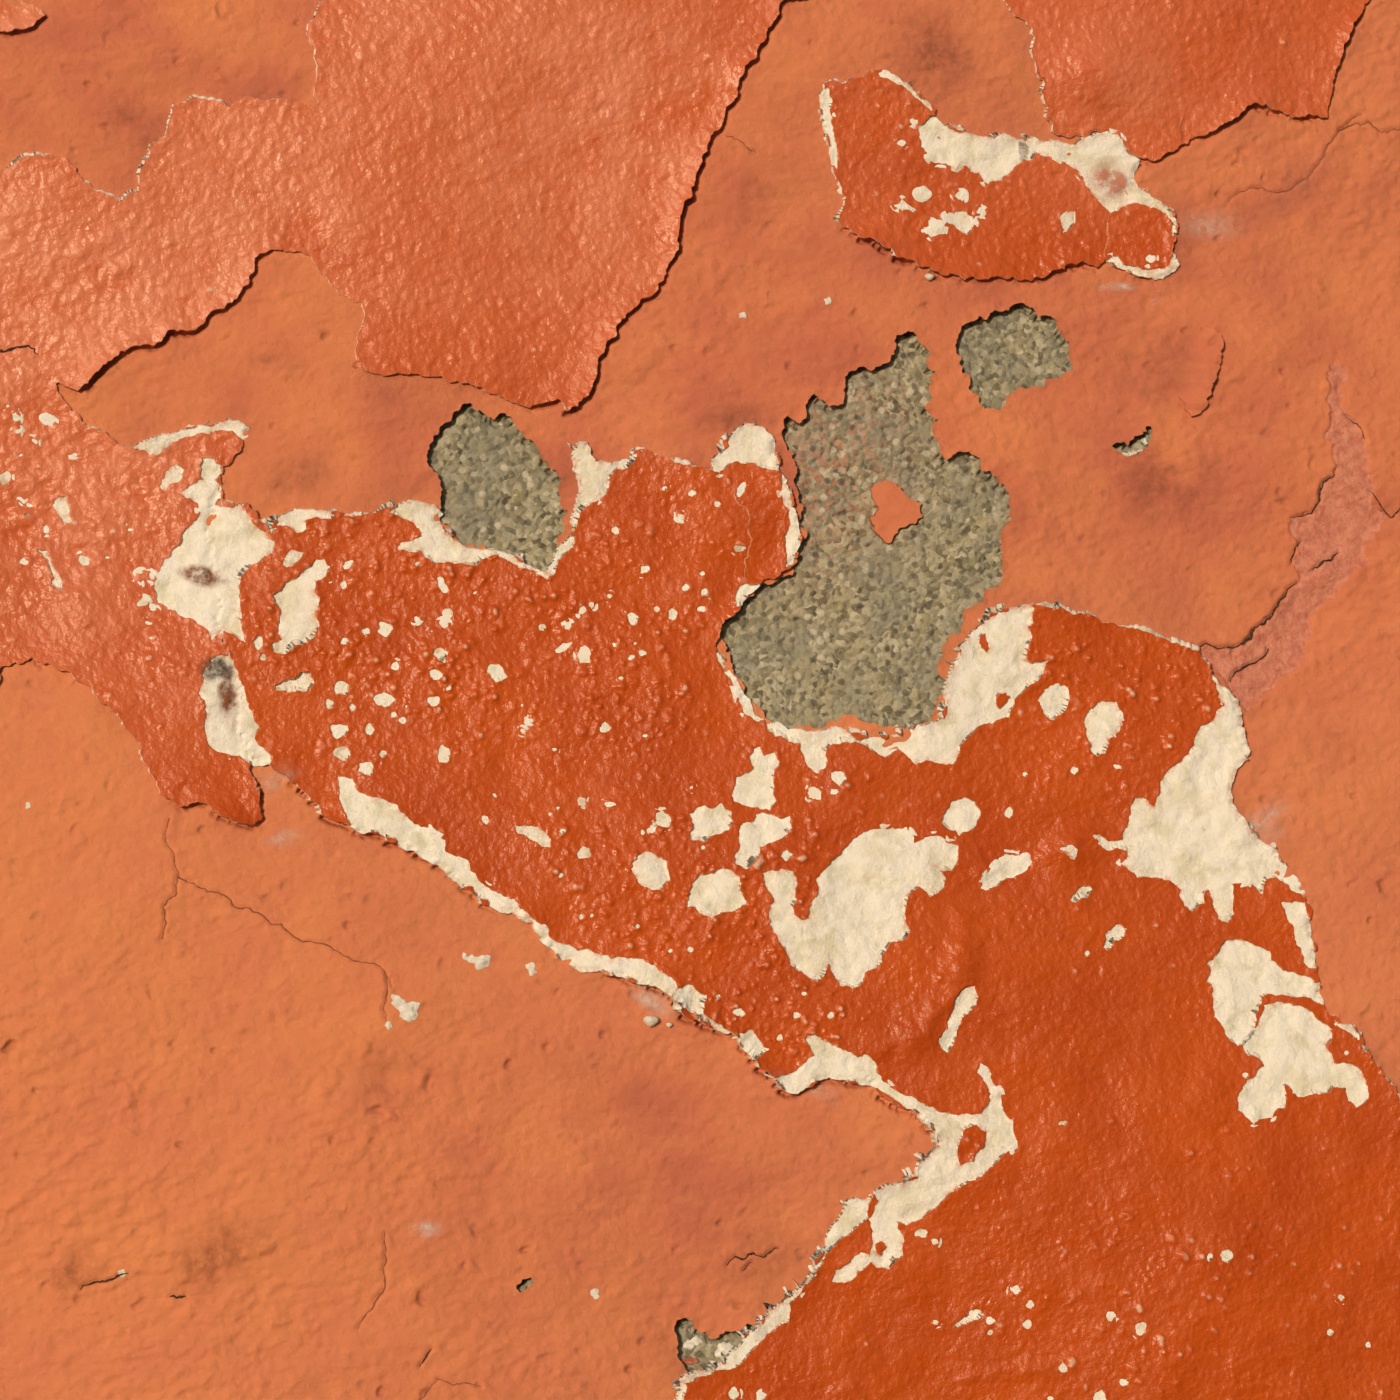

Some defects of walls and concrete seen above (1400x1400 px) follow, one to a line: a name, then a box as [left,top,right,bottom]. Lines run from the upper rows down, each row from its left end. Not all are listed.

peeling [817,0,1370,281]
crack [0,345,37,354]
spalling [955,303,1073,411]
spalling [1112,426,1152,456]
peeling [831,771,845,785]
peeling [805,785,821,800]
peeling [655,807,670,827]
peeling [1060,844,1078,860]
peeling [956,1123,986,1166]
peeling [1220,1250,1232,1261]
spalling [516,1278,533,1293]
peeling [1135,1322,1146,1335]